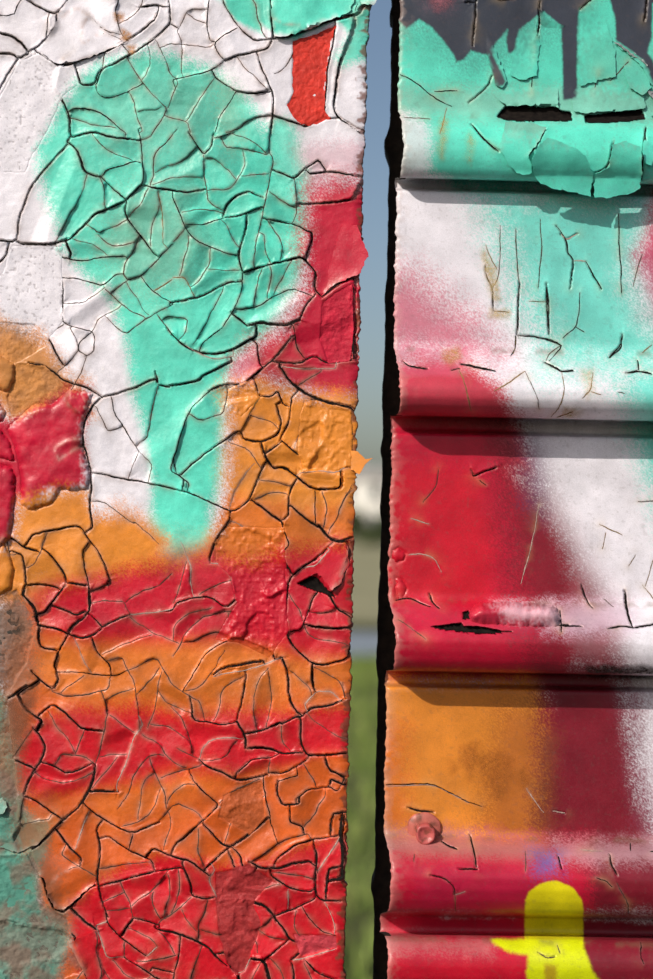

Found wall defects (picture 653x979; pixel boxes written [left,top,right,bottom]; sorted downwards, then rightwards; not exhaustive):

peeling [486,2,565,108]
peeling [571,1,653,114]
peeling [498,121,653,199]
crack [0,0,362,979]
crack [521,506,539,583]
crack [395,594,440,638]
crack [559,556,653,632]
crack [386,783,482,812]
crack [432,834,477,911]
crack [581,843,653,914]